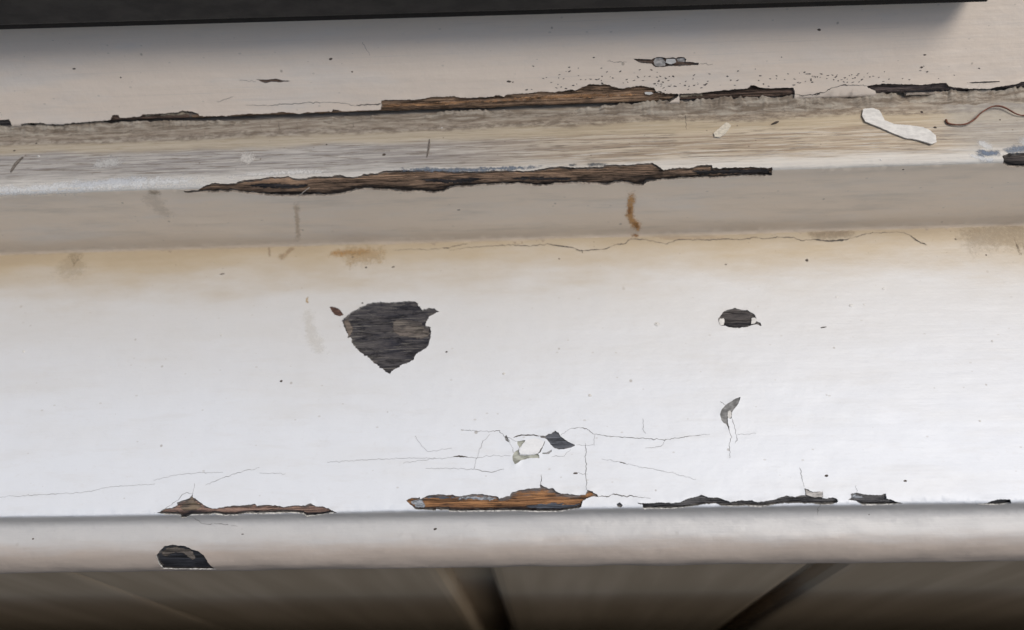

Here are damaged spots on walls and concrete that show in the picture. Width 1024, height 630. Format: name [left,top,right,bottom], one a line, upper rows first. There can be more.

peeling [104,57,1024,121]
peeling [191,164,772,195]
corrosion [626,194,640,237]
crack [401,232,926,253]
peeling [330,301,438,374]
peeling [718,308,761,328]
peeling [720,398,752,451]
crack [328,436,505,473]
peeling [158,483,334,525]
peeling [407,469,900,515]
peeling [157,545,213,568]